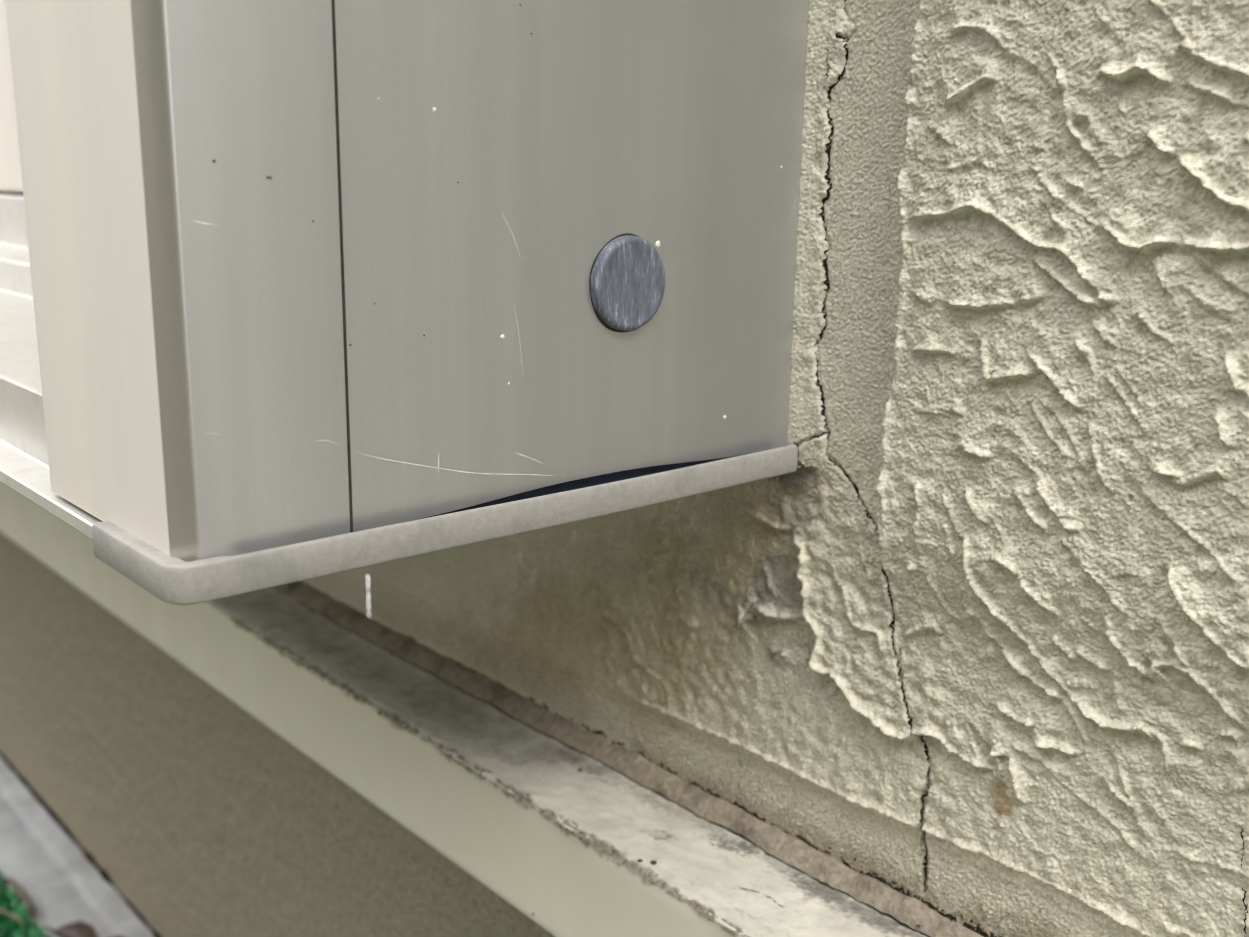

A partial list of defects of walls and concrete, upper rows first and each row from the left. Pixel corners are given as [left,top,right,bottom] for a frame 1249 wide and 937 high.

crack [793,0,879,535]
crack [296,568,990,937]
crack [1239,825,1248,934]